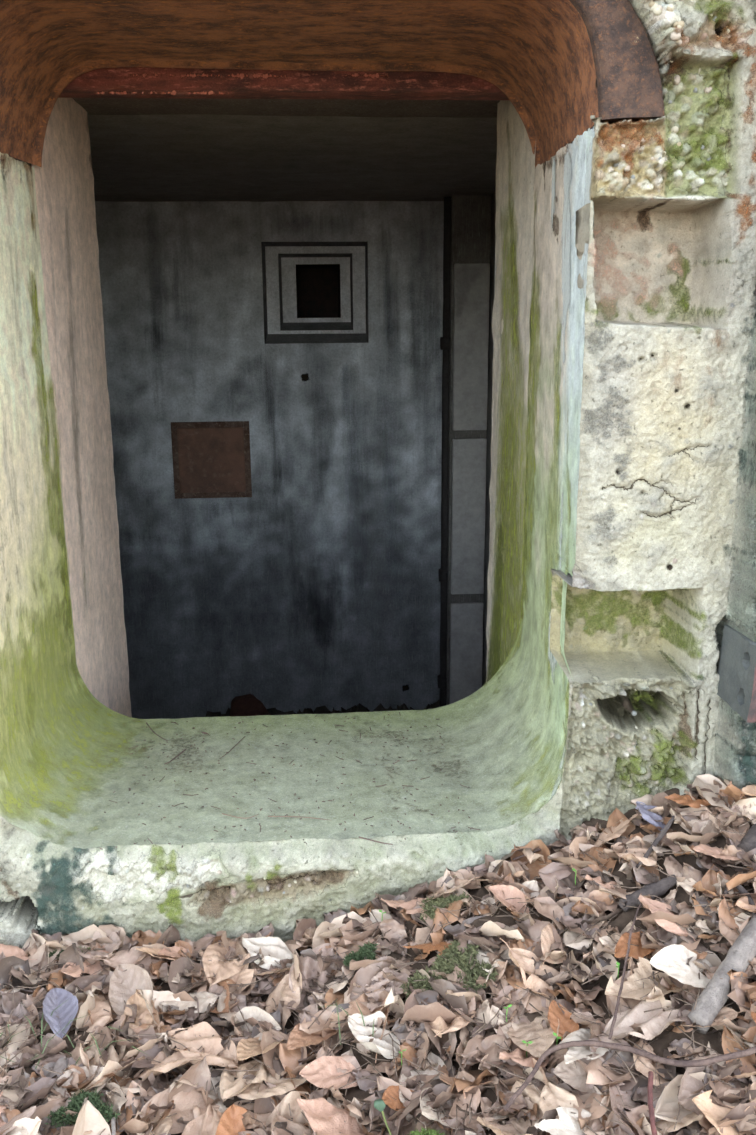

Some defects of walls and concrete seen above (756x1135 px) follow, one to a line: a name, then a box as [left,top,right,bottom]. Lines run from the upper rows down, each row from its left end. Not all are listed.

spalling [594,0,752,206]
corrosion [665,29,692,83]
corrosion [716,25,756,121]
damp [511,241,533,376]
damp [551,148,593,363]
corrosion [726,178,756,239]
damp [487,414,526,681]
crack [602,445,710,521]
spalling [564,651,696,816]
damp [37,859,76,940]